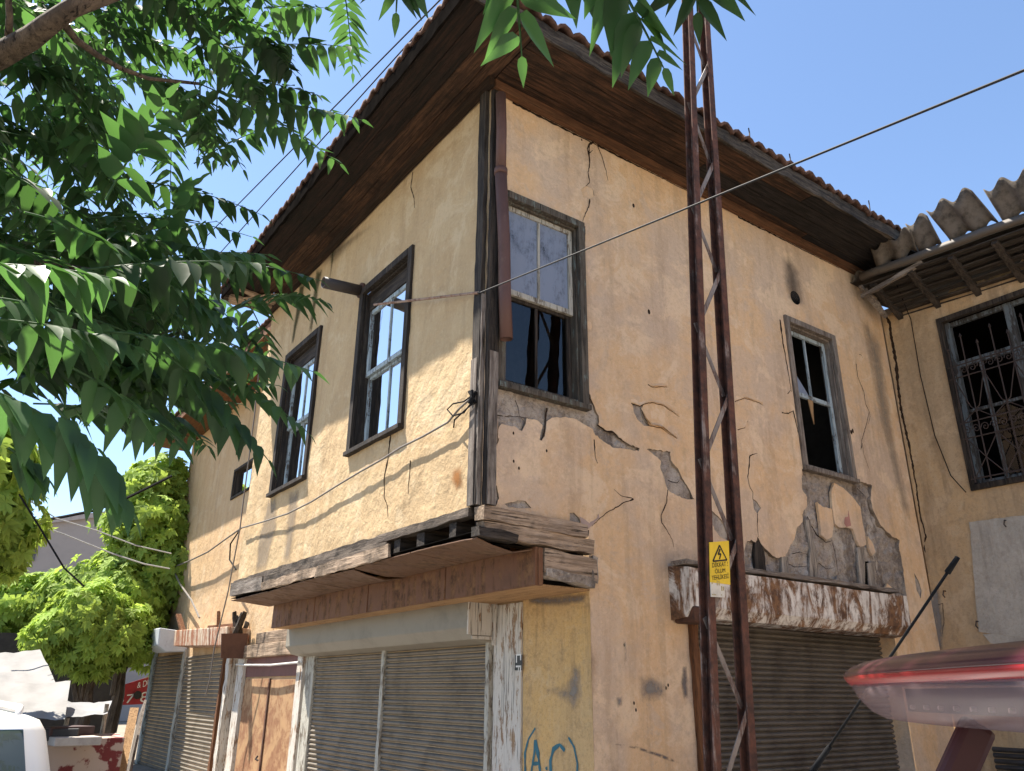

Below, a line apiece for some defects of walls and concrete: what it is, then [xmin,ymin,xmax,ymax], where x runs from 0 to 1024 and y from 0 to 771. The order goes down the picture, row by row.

crack [512,101,687,219]
crack [738,216,839,268]
spalling [497,381,694,499]
crack [592,490,634,526]
spalling [744,471,922,598]